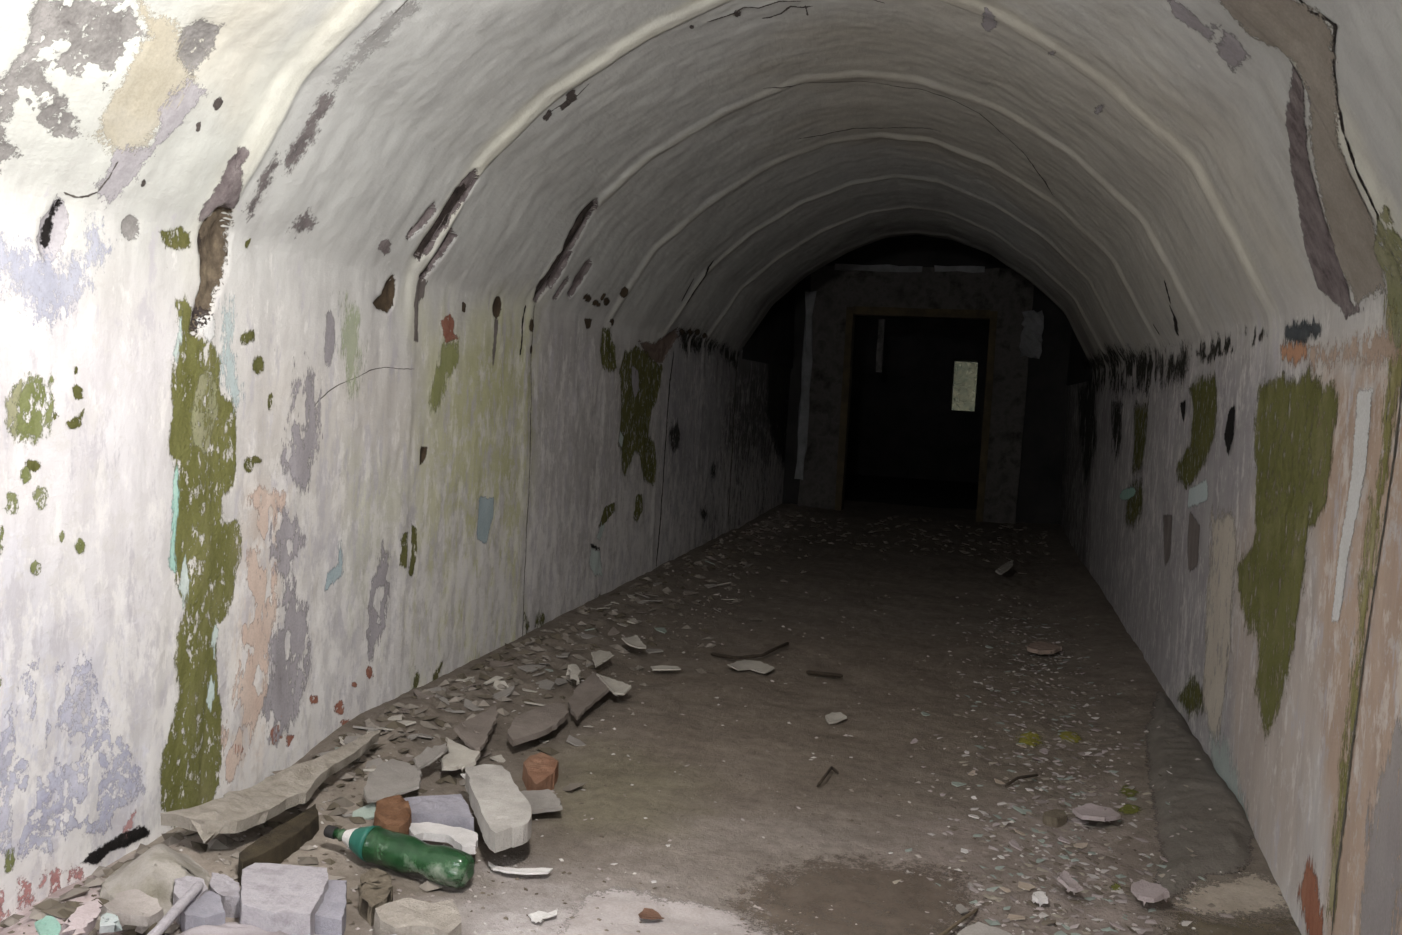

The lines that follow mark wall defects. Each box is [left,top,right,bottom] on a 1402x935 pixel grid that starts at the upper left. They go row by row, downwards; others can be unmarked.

peeling [0,0,224,328]
spalling [189,1,419,343]
spalling [378,168,479,342]
spalling [533,198,629,329]
crack [1153,281,1179,336]
crack [1220,0,1402,348]